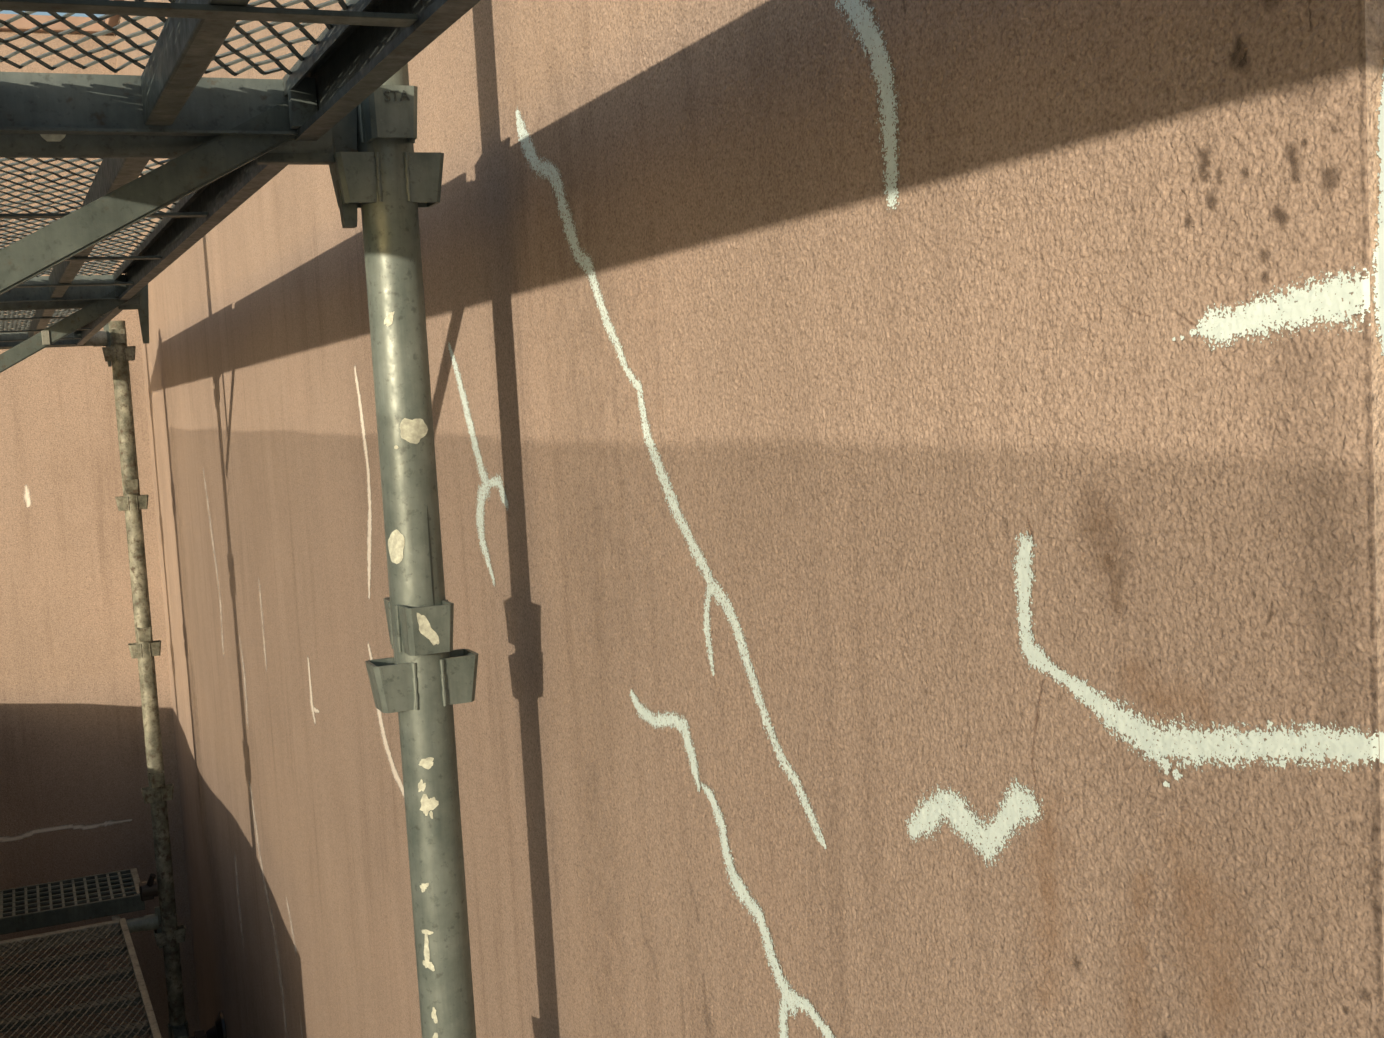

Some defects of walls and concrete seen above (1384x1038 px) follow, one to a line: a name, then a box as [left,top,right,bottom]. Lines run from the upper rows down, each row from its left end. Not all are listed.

crack [835,0,901,209]
leakage [1199,151,1221,178]
crack [1172,58,1384,355]
leakage [1273,209,1286,223]
leakage [1286,139,1306,181]
crack [448,342,509,586]
crack [515,110,827,849]
crack [1011,530,1384,787]
crack [630,688,836,1038]
crack [906,778,1044,868]